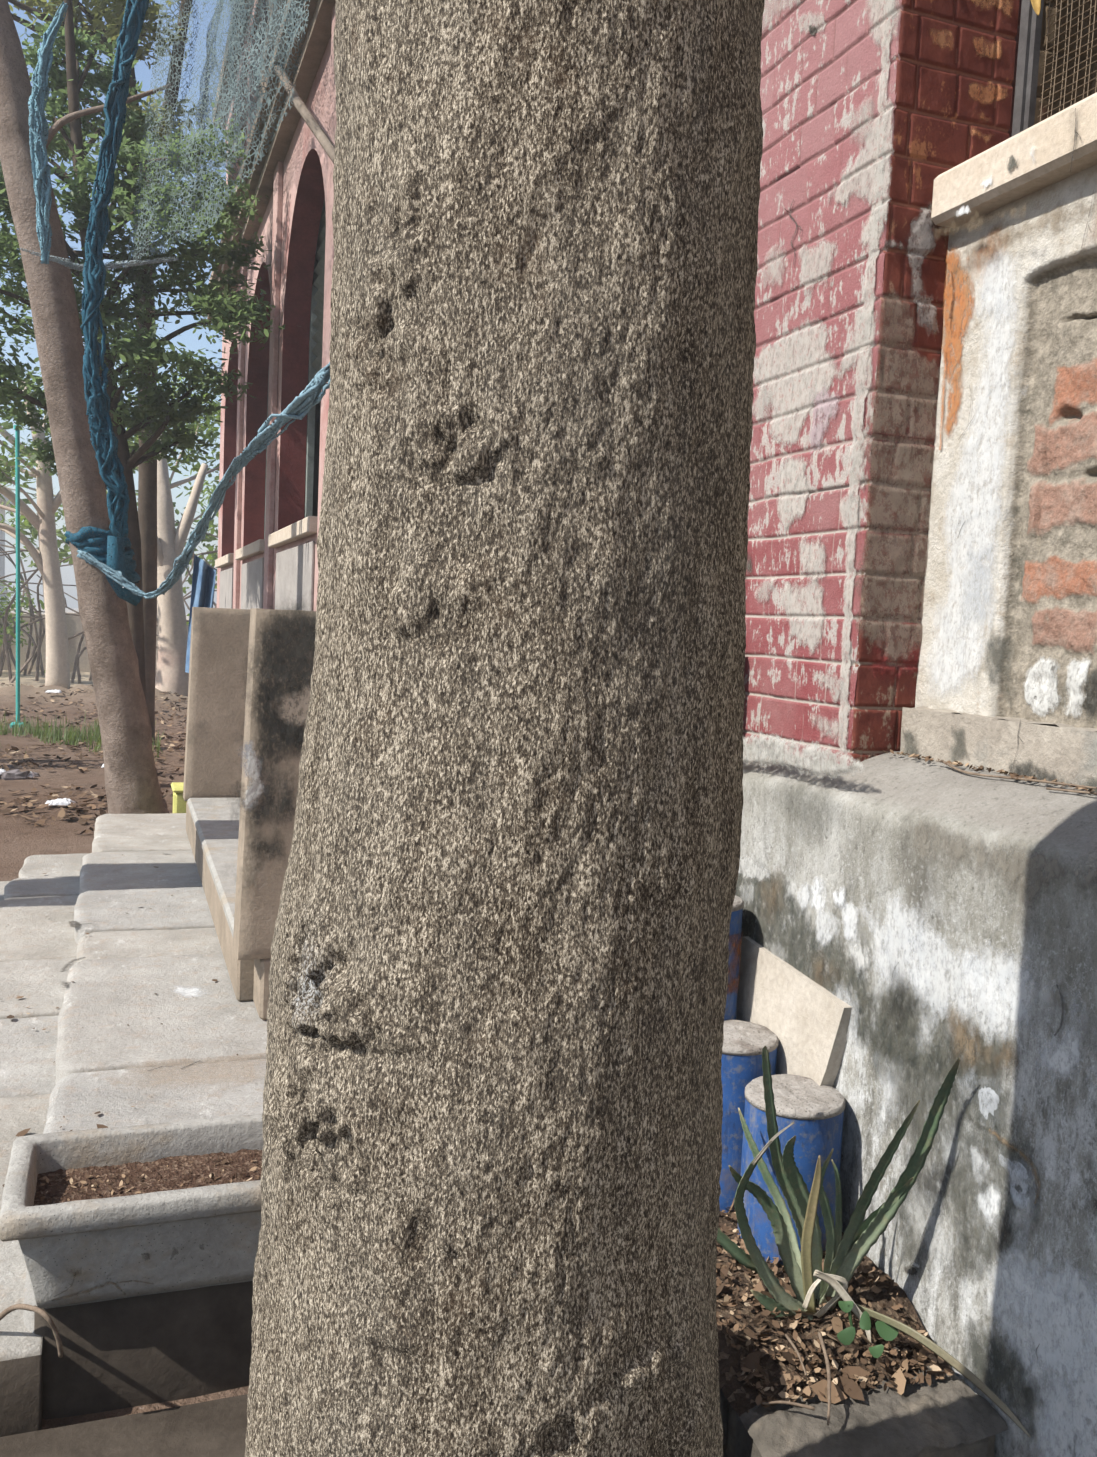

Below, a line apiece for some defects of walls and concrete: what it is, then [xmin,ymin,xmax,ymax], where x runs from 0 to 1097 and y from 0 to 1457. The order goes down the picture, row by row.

peeling [974,37,1002,59]
peeling [828,101,902,251]
peeling [763,240,834,292]
peeling [752,258,1013,691]
damp [249,604,316,756]
peeling [1067,659,1090,716]
flaking render [743,715,864,778]
damp [1009,762,1062,782]
damp [235,777,290,858]
damp [914,820,1097,902]
damp [735,872,1029,1260]
damp [964,1324,1034,1433]